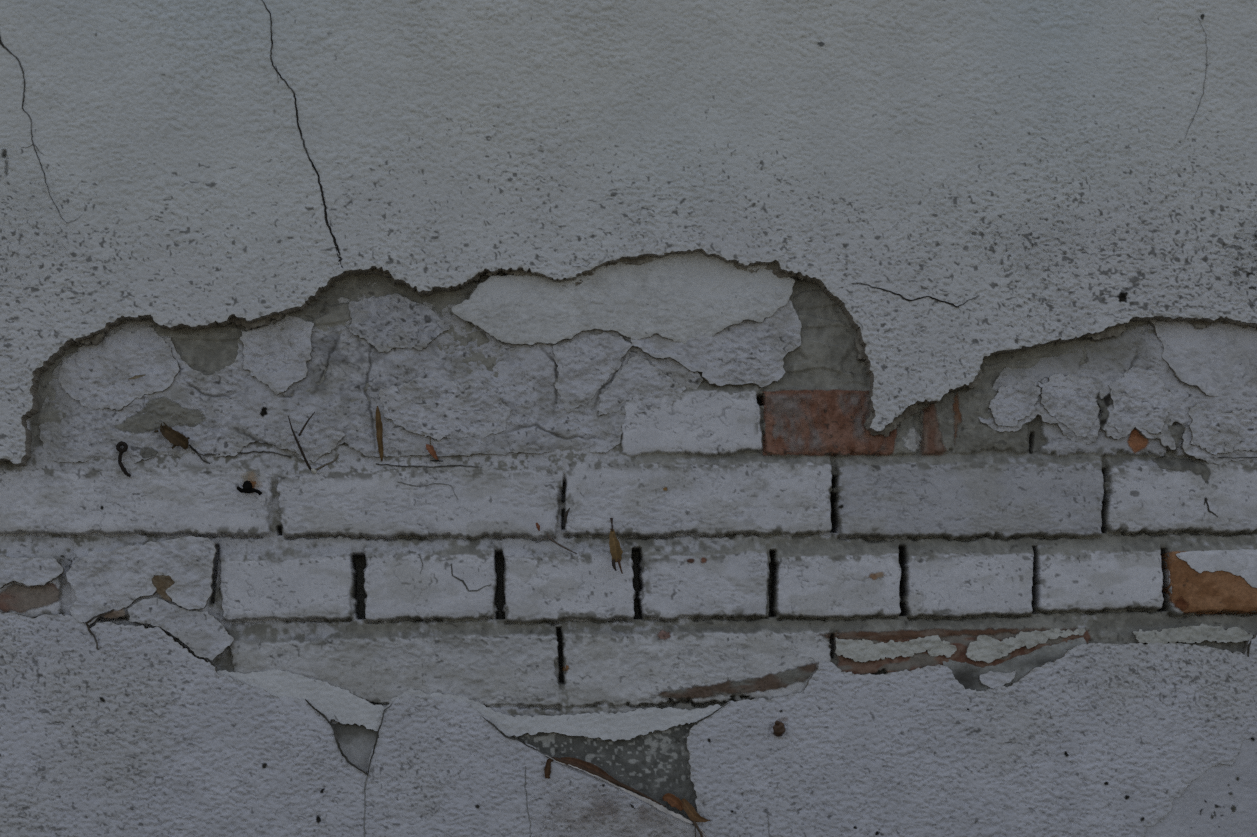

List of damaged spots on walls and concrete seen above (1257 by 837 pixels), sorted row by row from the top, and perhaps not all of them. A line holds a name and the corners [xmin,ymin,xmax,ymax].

crack [0,37,83,223]
crack [262,0,345,273]
spalling [39,251,962,464]
spalling [978,319,1257,483]
peeling [0,536,235,660]
peeling [658,663,817,699]
peeling [820,628,1086,691]
flaking render [1160,549,1257,614]
spalling [331,722,379,774]